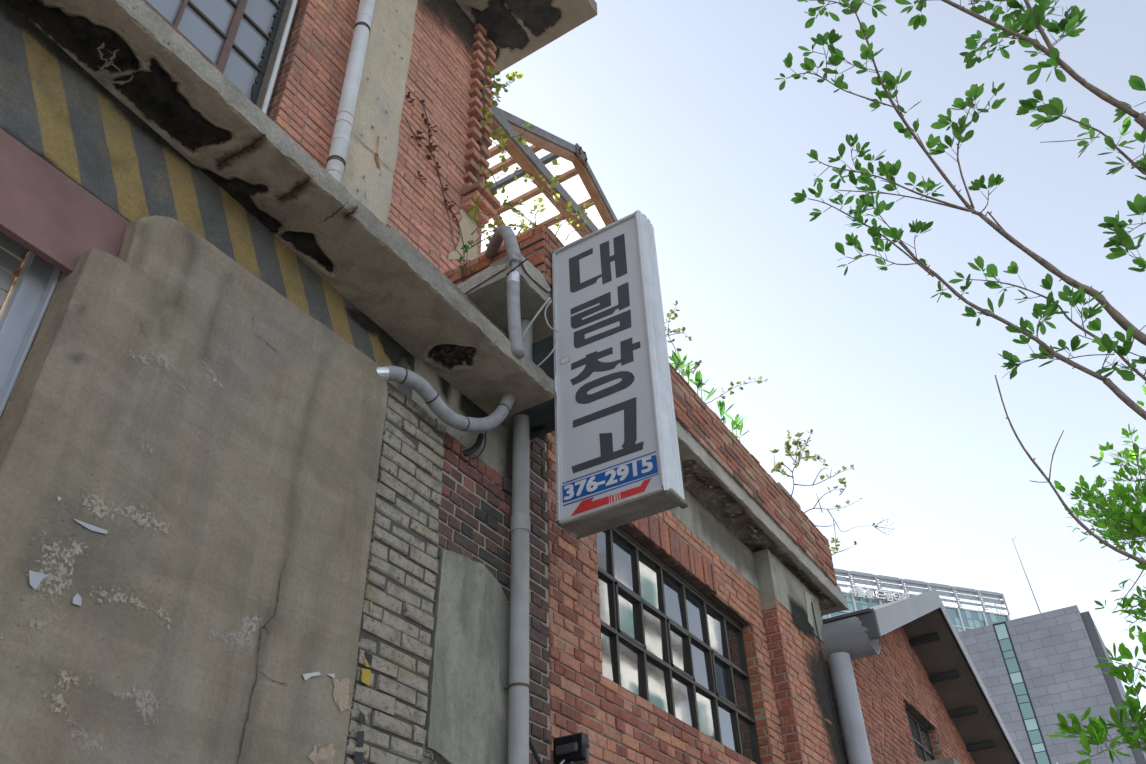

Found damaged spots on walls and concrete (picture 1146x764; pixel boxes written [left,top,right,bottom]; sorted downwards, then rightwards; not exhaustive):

spalling [7,0,232,152]
spalling [470,0,561,62]
spalling [199,168,333,272]
spalling [429,345,476,369]
peeling [77,486,175,537]
peeling [0,529,95,660]
peeling [90,582,172,629]
crack [237,551,290,764]
peeling [305,388,390,764]
peeling [32,668,110,752]